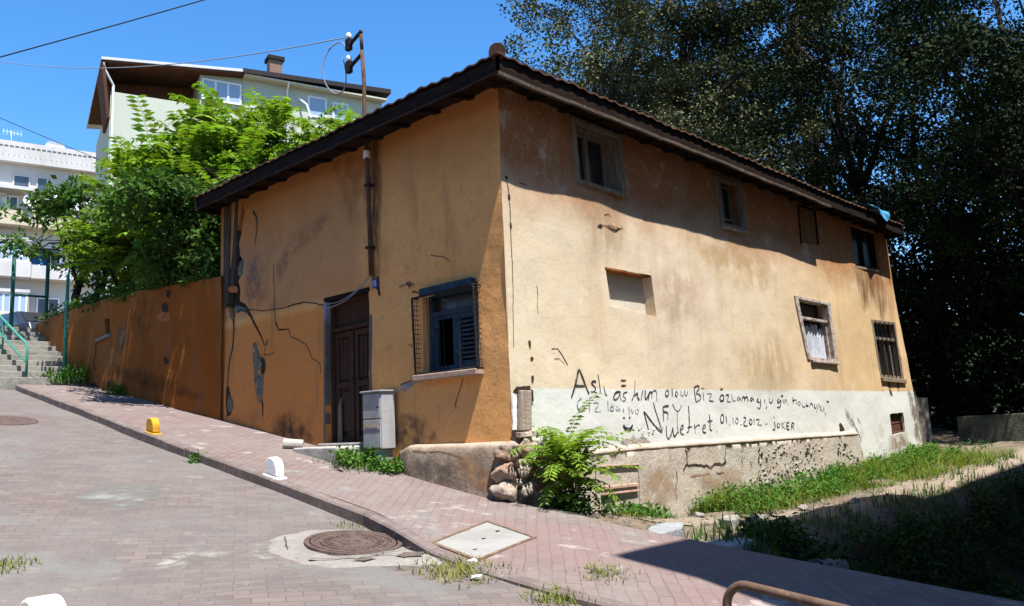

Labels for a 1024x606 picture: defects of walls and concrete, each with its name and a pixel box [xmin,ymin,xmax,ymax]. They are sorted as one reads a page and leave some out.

crack [226,263,324,416]
spalling [252,342,265,416]
crack [675,448,752,498]
spalling [758,441,823,486]